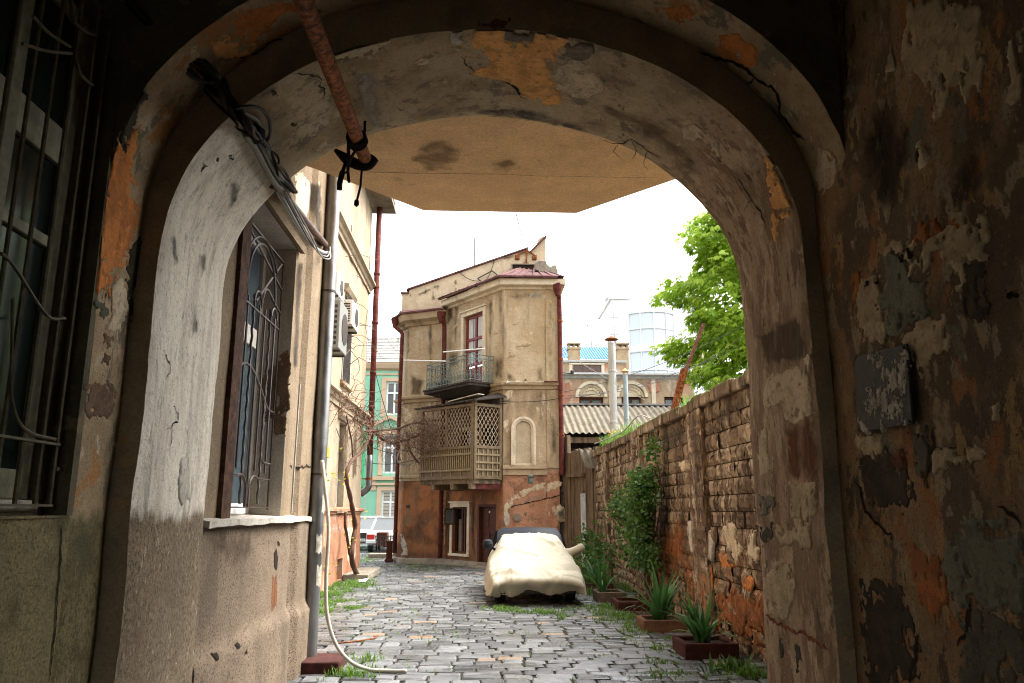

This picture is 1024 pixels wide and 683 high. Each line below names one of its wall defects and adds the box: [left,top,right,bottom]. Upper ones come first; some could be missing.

peeling [450,18,605,107]
crack [699,52,805,140]
peeling [885,0,988,121]
peeling [1005,32,1024,121]
crack [604,139,659,178]
peeling [764,156,791,241]
peeling [83,91,149,420]
peeling [850,211,999,384]
crack [512,492,564,507]
peeling [855,431,917,516]
peeling [932,443,994,475]
peeling [859,543,949,683]